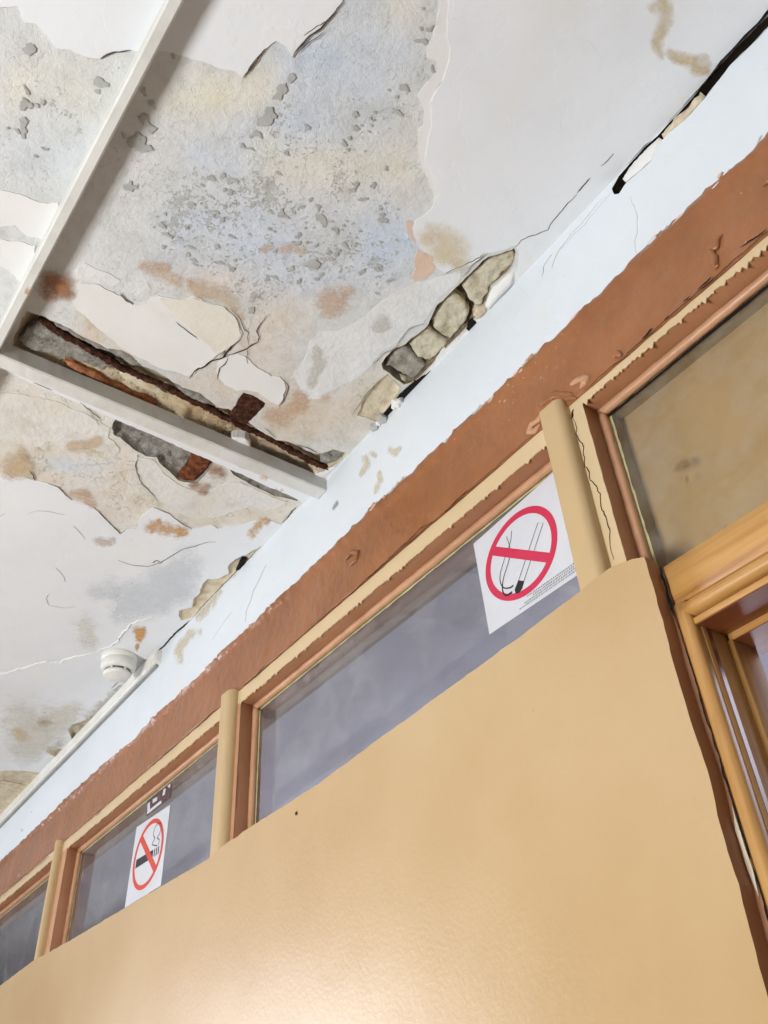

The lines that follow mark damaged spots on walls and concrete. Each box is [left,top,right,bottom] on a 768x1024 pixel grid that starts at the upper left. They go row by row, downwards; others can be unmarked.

damp [672,54,707,73]
rust [43,275,73,299]
peeling [0,0,519,479]
crack [571,230,768,560]
crack [28,471,85,540]
peeling [0,370,303,533]
crack [121,455,208,567]
crack [159,550,263,650]
spalling [179,546,261,621]
crack [243,435,533,686]
crack [68,710,215,839]